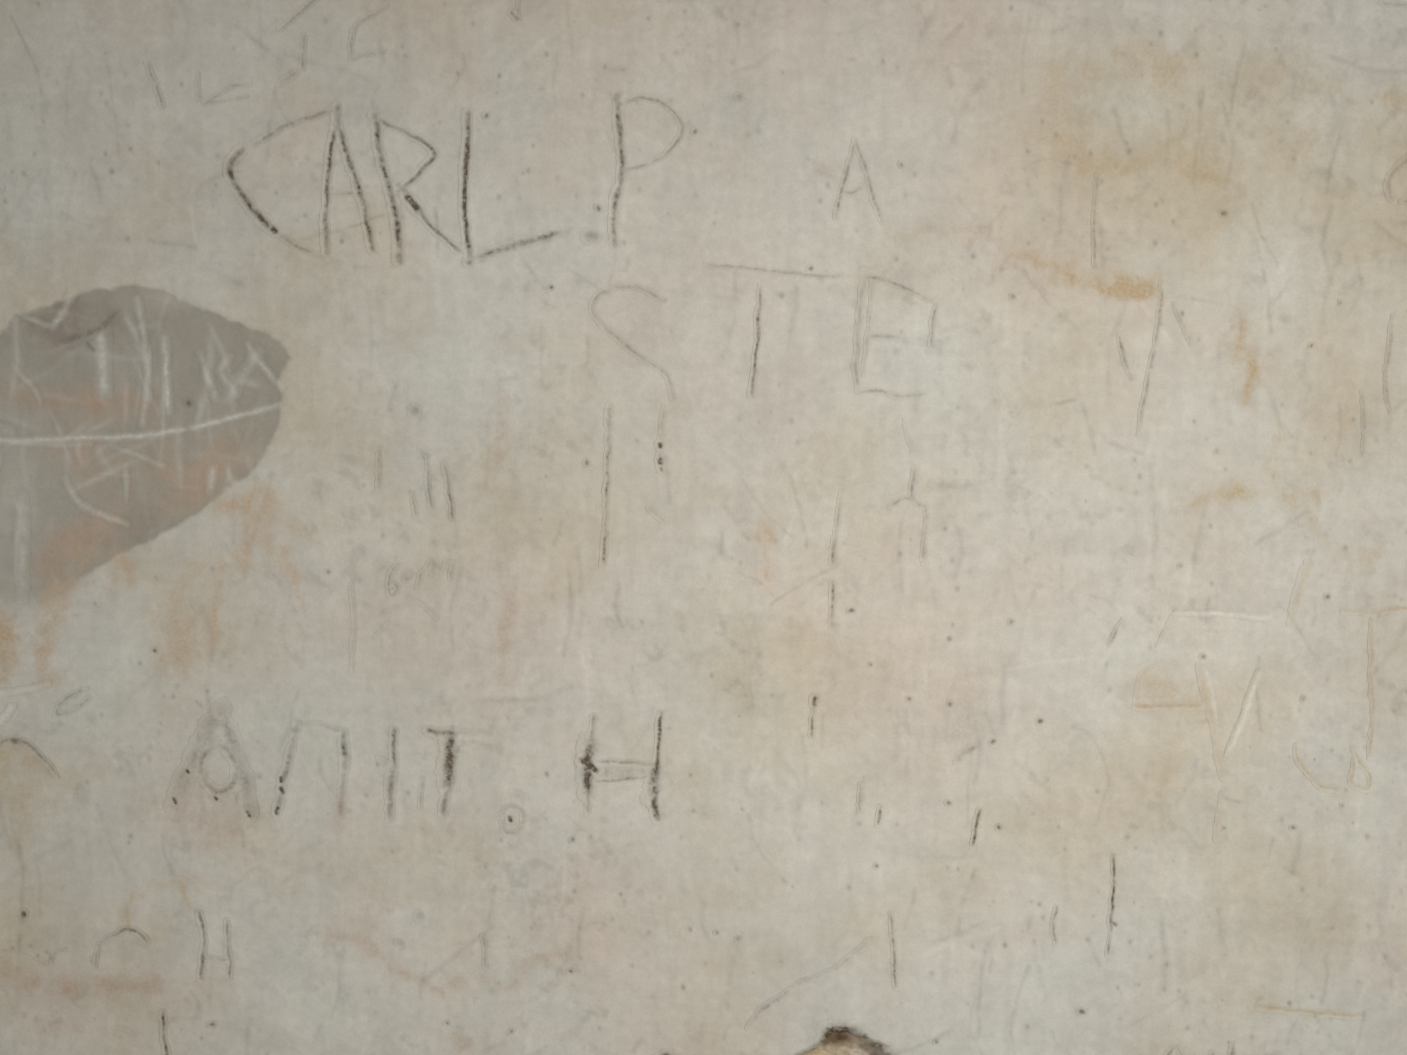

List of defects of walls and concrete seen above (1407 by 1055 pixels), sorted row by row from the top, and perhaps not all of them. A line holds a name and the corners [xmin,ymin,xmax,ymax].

spalling [794,1018,900,1055]